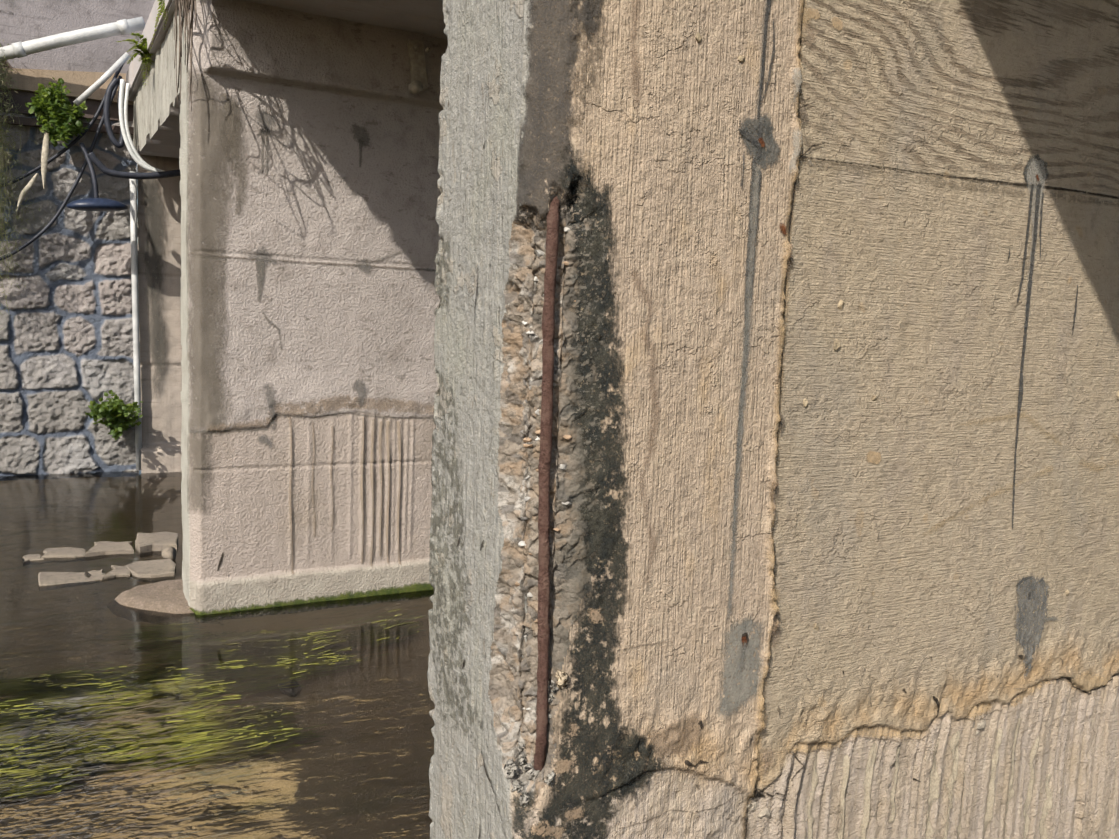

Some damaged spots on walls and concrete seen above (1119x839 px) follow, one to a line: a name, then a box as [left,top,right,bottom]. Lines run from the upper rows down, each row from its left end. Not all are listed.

water stain [186,71,246,510]
water stain [256,110,273,175]
water stain [252,247,277,301]
water stain [265,383,276,429]
spalling [488,175,611,807]
water stain [512,0,666,839]
water stain [720,0,780,716]
crack [619,0,1119,839]
water stain [1008,154,1049,529]
water stain [1015,576,1056,678]